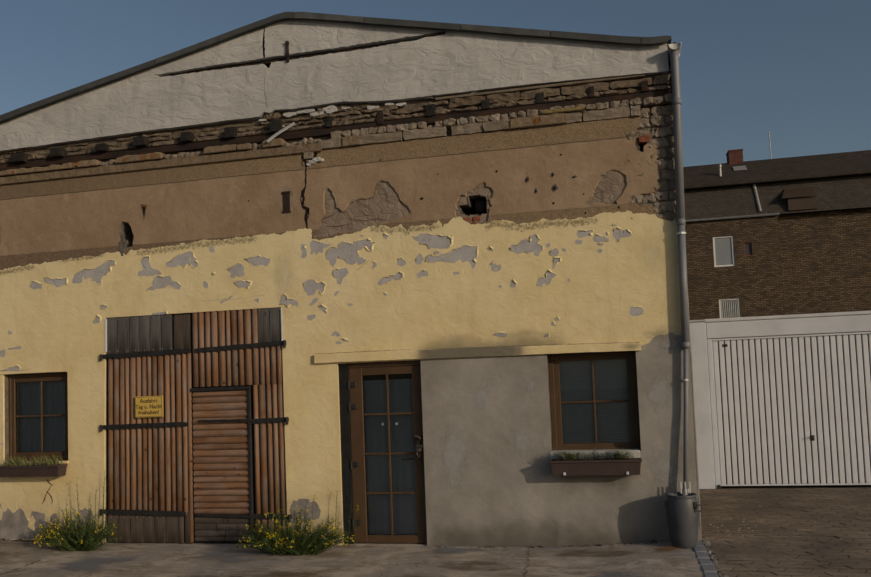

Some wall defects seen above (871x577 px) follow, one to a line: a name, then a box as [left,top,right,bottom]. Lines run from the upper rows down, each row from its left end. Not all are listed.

crack [258,27,266,58]
crack [300,156,309,228]
flaking render [454,182,494,225]
flaking render [583,169,627,214]
peeling [30,222,134,290]
peeling [138,251,199,291]
peeling [220,255,270,303]
flaking render [278,180,411,321]
peeling [377,233,501,296]
peeling [509,234,566,287]
peeling [575,223,632,253]
peeling [0,499,59,539]